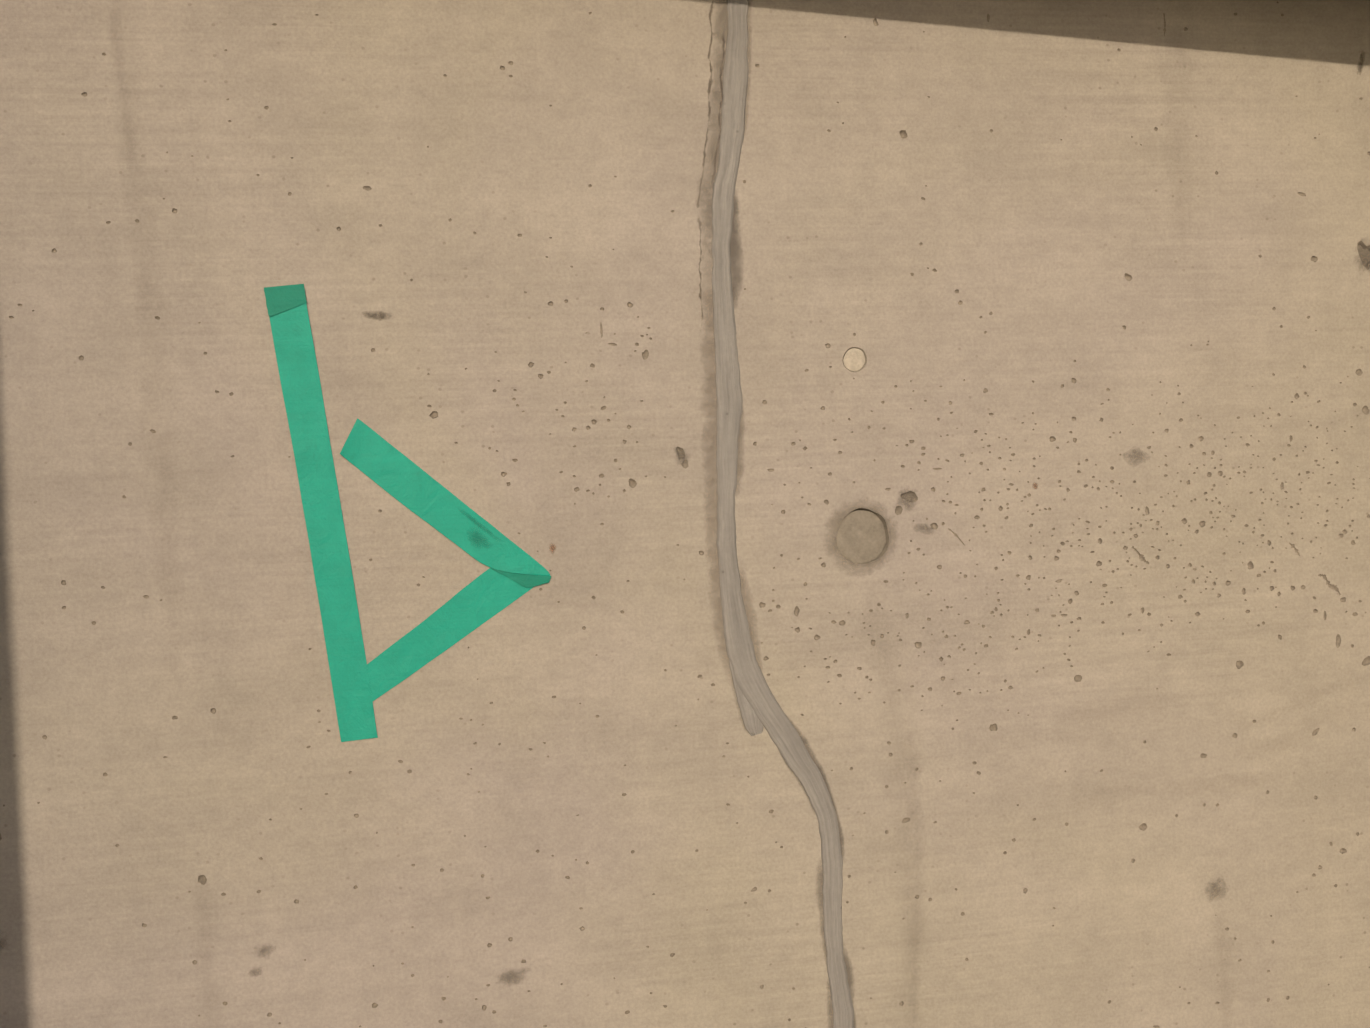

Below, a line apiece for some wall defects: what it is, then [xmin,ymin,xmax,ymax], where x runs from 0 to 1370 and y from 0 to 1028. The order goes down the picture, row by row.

crack [711,0,854,1028]